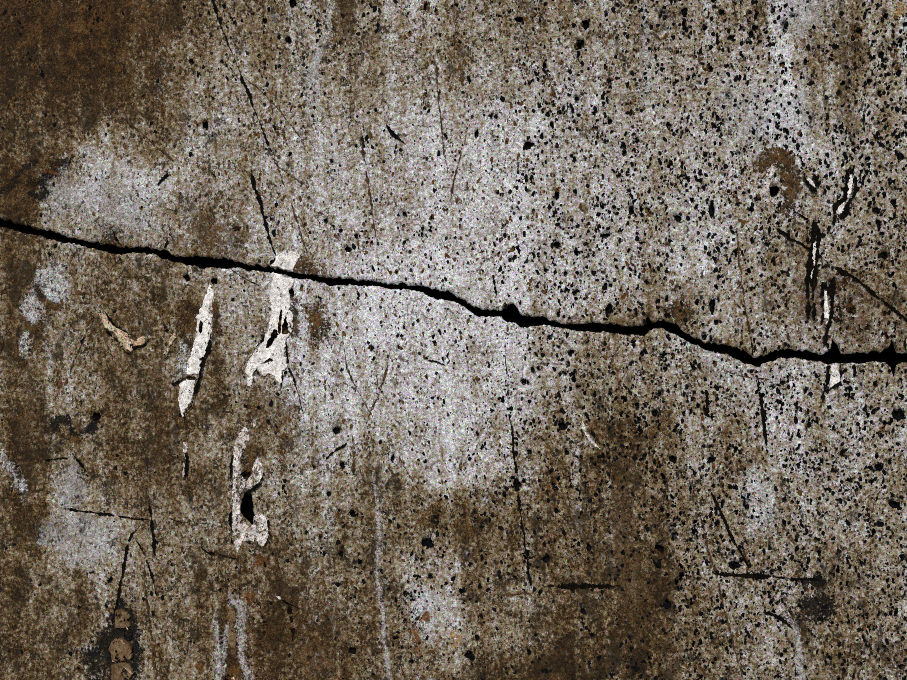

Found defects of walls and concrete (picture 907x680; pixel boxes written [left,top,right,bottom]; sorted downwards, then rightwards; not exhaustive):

crack [211,0,285,187]
water stain [28,180,49,203]
peeling [164,278,221,420]
spalling [245,251,300,387]
crack [0,170,907,445]
peeling [228,419,270,553]
spalling [80,597,144,680]